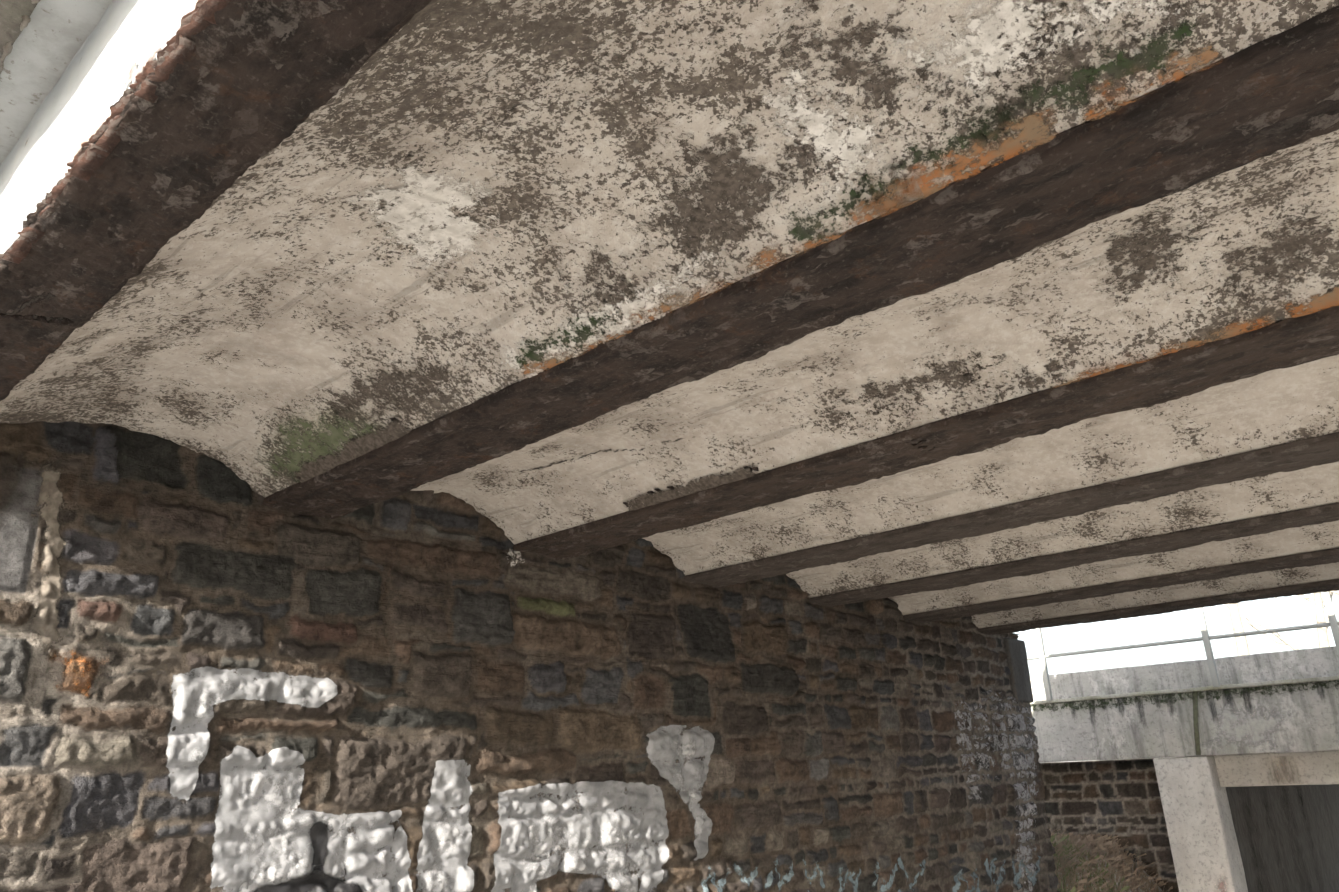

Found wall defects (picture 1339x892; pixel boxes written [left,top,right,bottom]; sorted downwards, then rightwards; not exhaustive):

peeling [0,0,231,278]
corrosion [523,108,1058,375]
corrosion [1080,42,1222,127]
peeling [293,342,469,484]